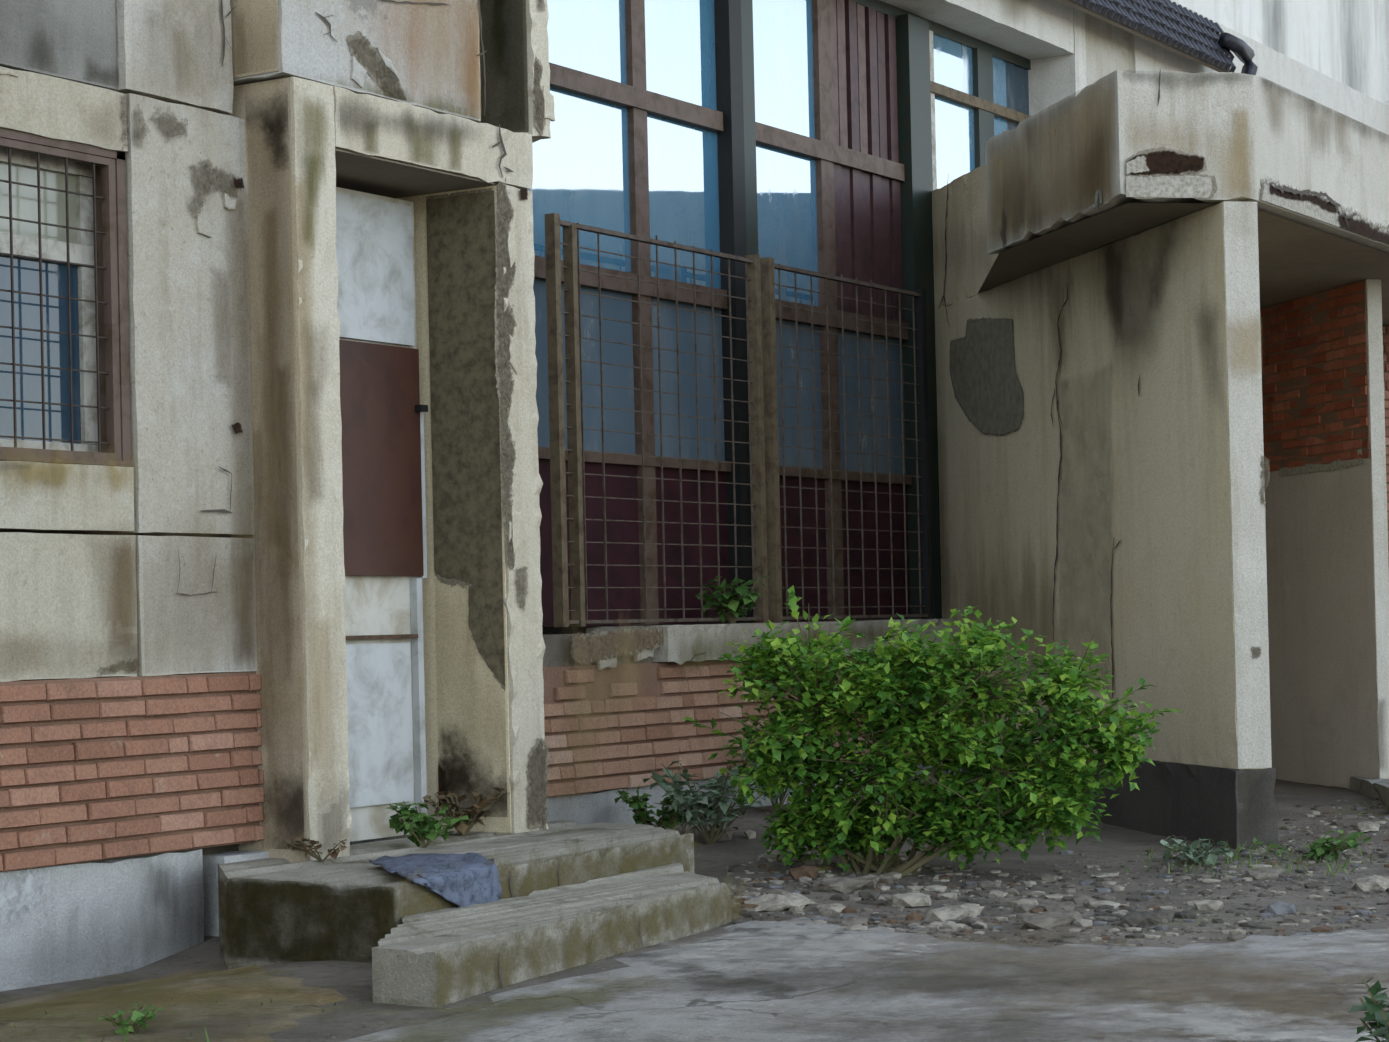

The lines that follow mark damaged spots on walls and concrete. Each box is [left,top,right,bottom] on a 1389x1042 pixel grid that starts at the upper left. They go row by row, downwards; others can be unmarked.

spalling [347,31,407,101]
crack [381,0,513,178]
spalling [189,159,244,238]
spalling [1126,146,1217,198]
spalling [1260,179,1389,244]
peeling [426,179,528,690]
crack [1051,289,1068,642]
leakage [438,738,507,817]
spalling [526,738,549,830]